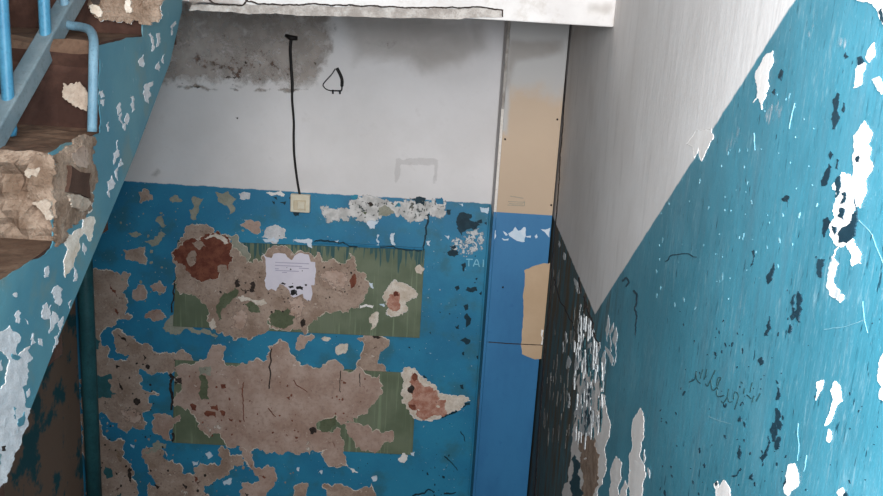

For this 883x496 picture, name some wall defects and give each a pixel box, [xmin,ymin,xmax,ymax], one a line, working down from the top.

flaking render [62,82,88,111]
flaking render [88,0,165,70]
damp [164,1,330,92]
flaking render [189,4,502,19]
peeling [844,43,883,95]
peeling [857,0,883,24]
peeling [320,195,550,245]
peeling [812,121,873,303]
peeling [93,188,418,496]
peeling [521,263,550,359]
flaking render [401,367,470,424]
peeling [562,372,646,496]